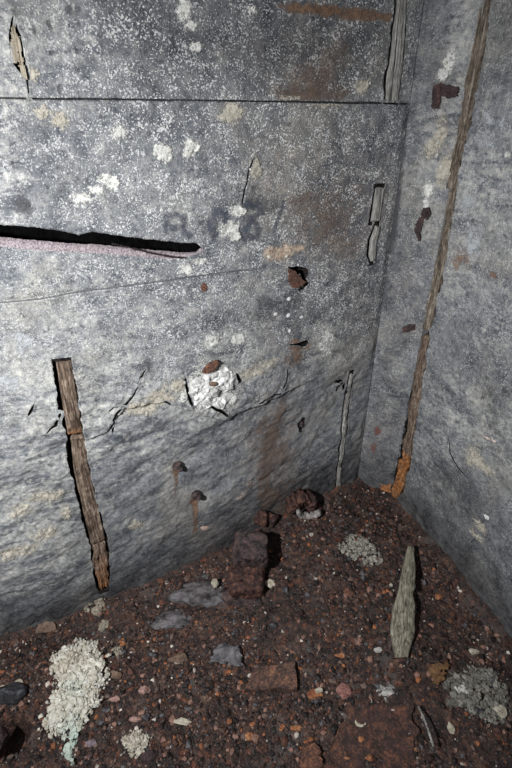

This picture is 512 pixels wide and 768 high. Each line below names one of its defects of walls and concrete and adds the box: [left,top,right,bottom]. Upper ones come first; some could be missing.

rust [280,2,392,22]
crack [364,183,387,267]
rust [414,207,431,241]
spalling [175,359,239,412]
crack [234,370,244,387]
crack [256,366,290,406]
crack [24,357,231,594]